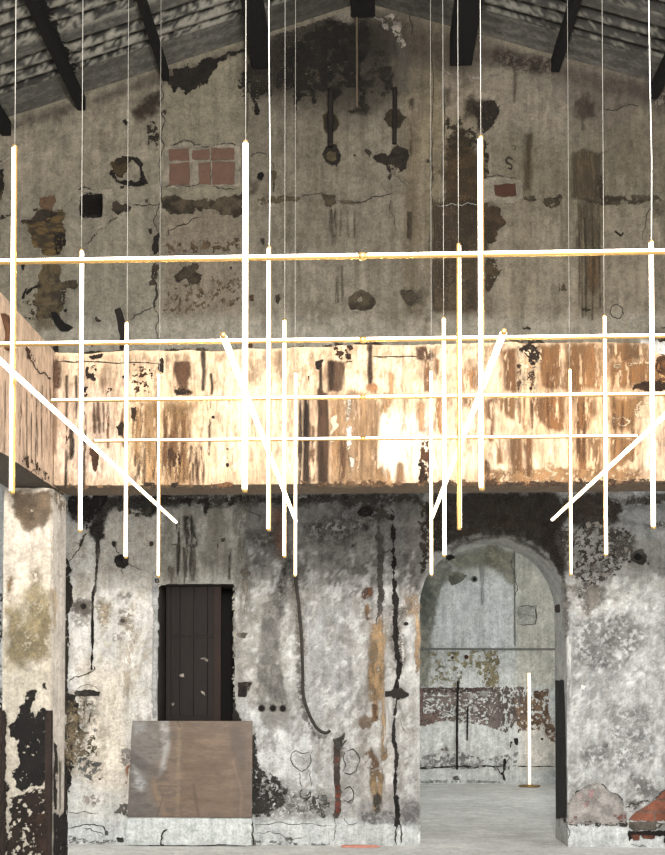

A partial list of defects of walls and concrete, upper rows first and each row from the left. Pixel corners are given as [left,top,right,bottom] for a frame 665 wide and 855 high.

crack [57,83,165,397]
flaking render [21,139,277,328]
damp [432,96,506,311]
damp [12,346,53,531]
damp [64,376,99,488]
damp [298,345,404,485]
peeling [0,683,68,855]
peeling [65,558,73,705]
rust [359,588,388,811]
rust [404,595,421,673]
peeling [190,440,665,687]
peeling [420,650,567,823]